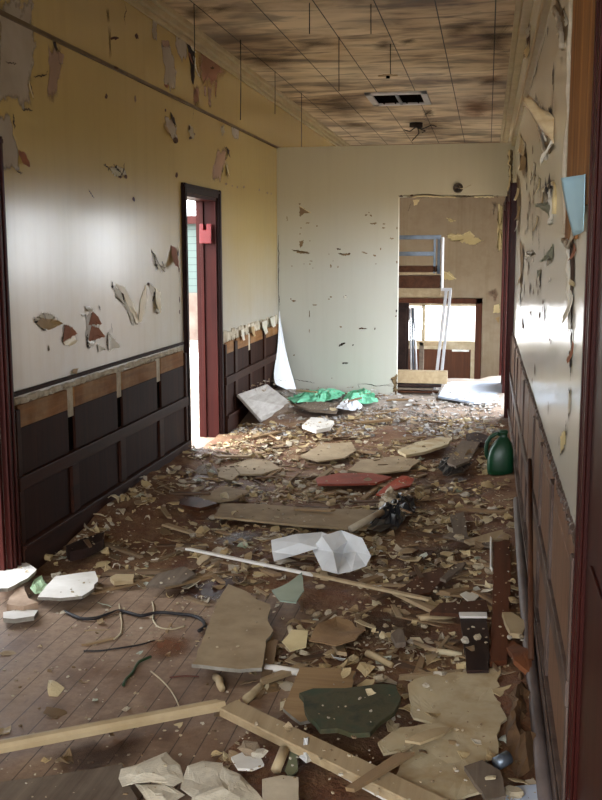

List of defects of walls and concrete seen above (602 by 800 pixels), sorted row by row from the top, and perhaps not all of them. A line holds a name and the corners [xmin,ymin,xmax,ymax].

peeling [0,0,64,111]
peeling [152,20,200,89]
damp [194,53,224,106]
flaking render [551,0,596,206]
peeling [0,114,30,174]
flaking render [399,194,500,216]
peeling [151,245,180,273]
flaking render [507,136,578,329]
peeling [34,306,120,352]
peeling [111,282,161,325]
peeling [235,316,276,341]